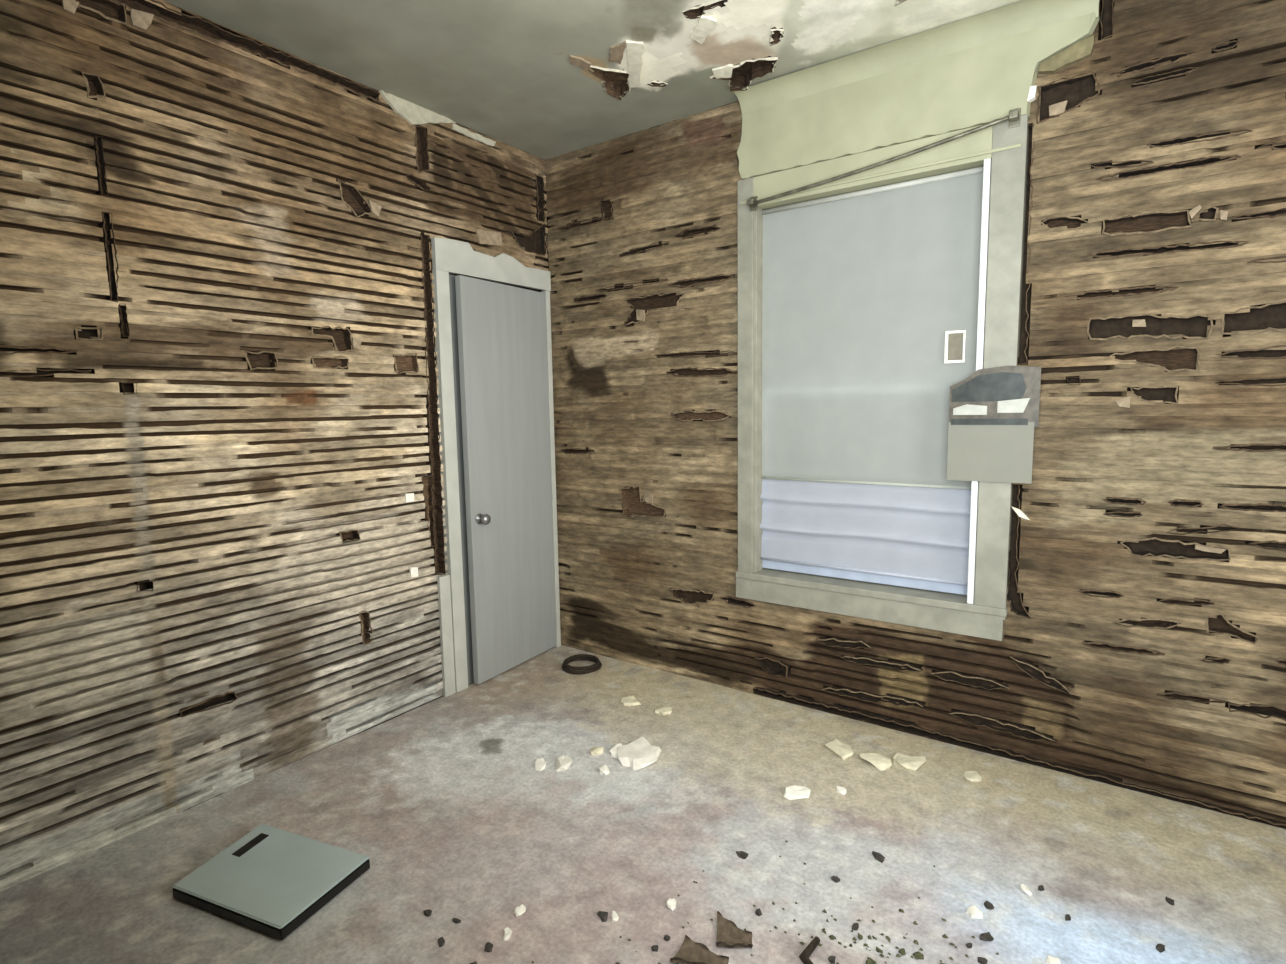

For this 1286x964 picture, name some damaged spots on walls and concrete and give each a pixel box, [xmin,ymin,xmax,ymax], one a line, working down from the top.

water stain [579,0,731,60]
peeling [690,0,907,72]
peeling [606,37,733,97]
spalling [1027,71,1100,124]
peeling [452,123,496,147]
peeling [368,200,382,217]